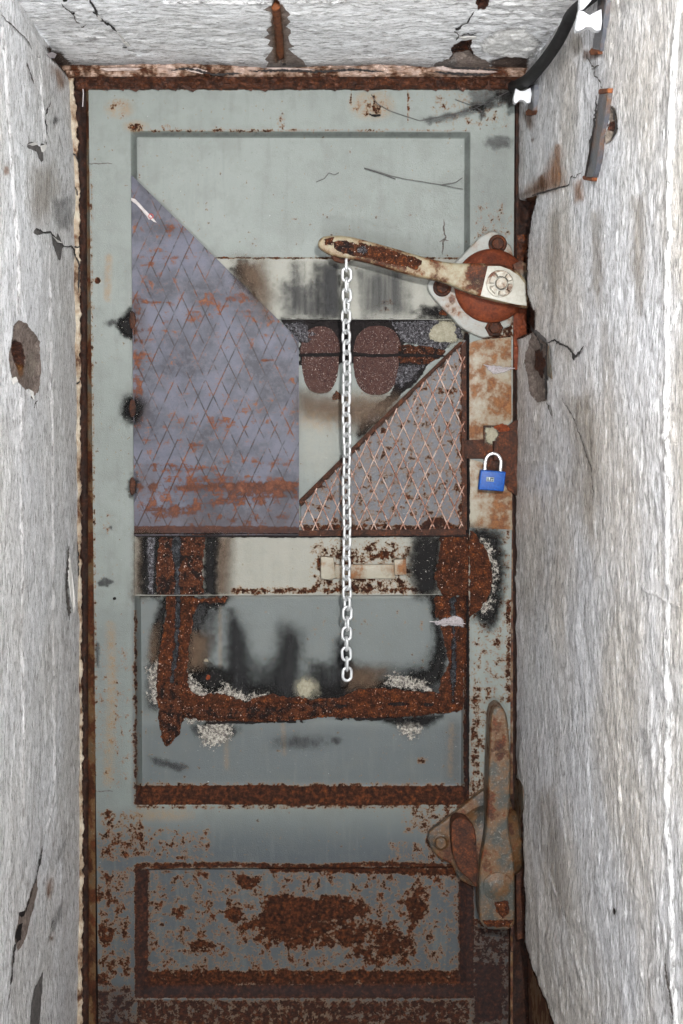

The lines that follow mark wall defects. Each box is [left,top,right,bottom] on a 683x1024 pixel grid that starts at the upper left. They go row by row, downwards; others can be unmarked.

crack [61,0,131,51]
spalling [264,0,316,70]
crack [37,228,80,293]
spalling [517,196,552,416]
spalling [9,320,41,408]
crack [547,339,584,360]
rust [155,531,493,746]
crack [8,944,16,1001]